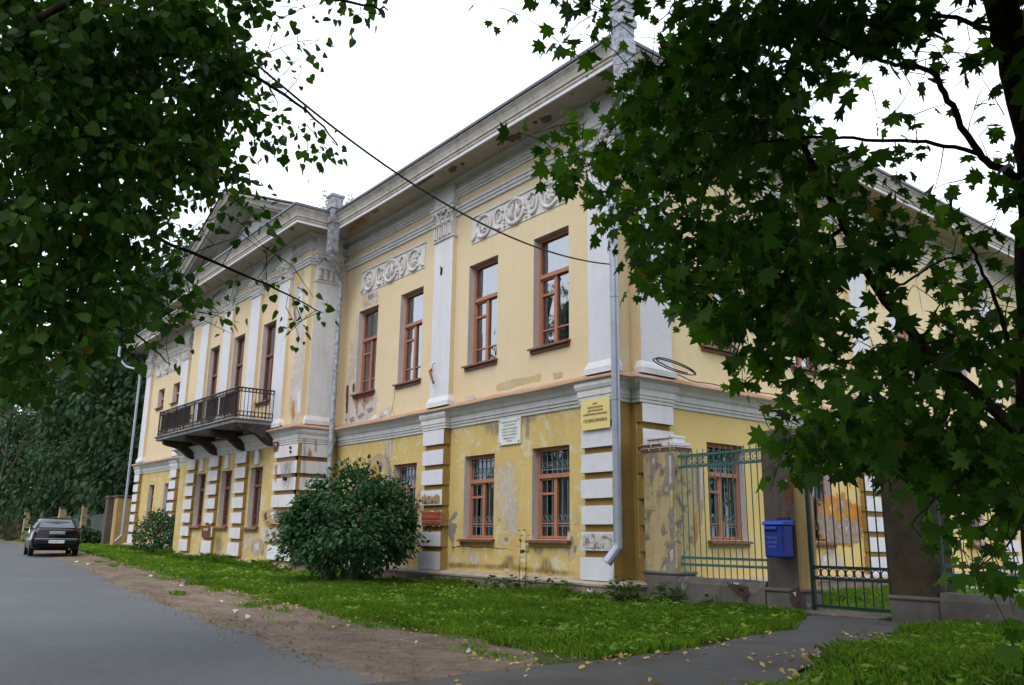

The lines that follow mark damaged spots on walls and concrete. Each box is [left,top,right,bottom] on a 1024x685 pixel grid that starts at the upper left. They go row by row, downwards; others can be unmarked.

peeling [344,289,391,424]
peeling [566,513,612,561]
peeling [649,451,676,572]
peeling [816,491,863,569]